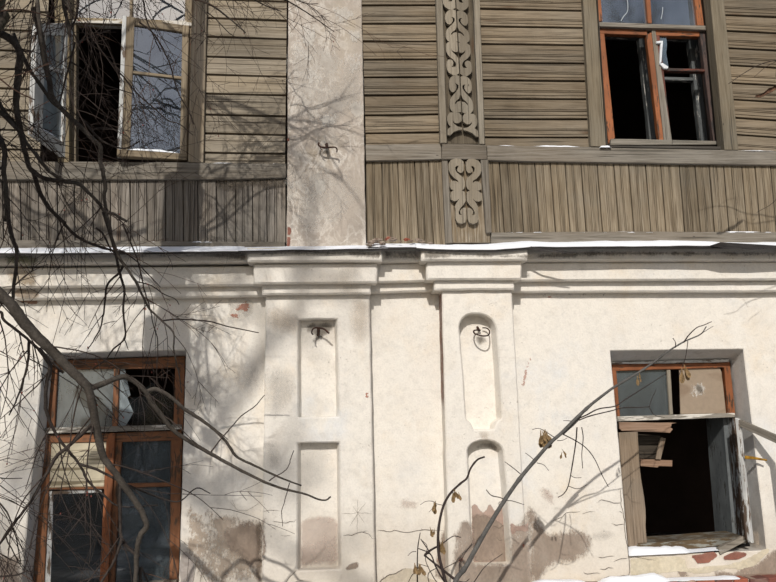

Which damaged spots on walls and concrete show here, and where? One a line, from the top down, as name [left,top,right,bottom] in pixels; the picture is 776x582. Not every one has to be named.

flaking render [692,552,747,563]